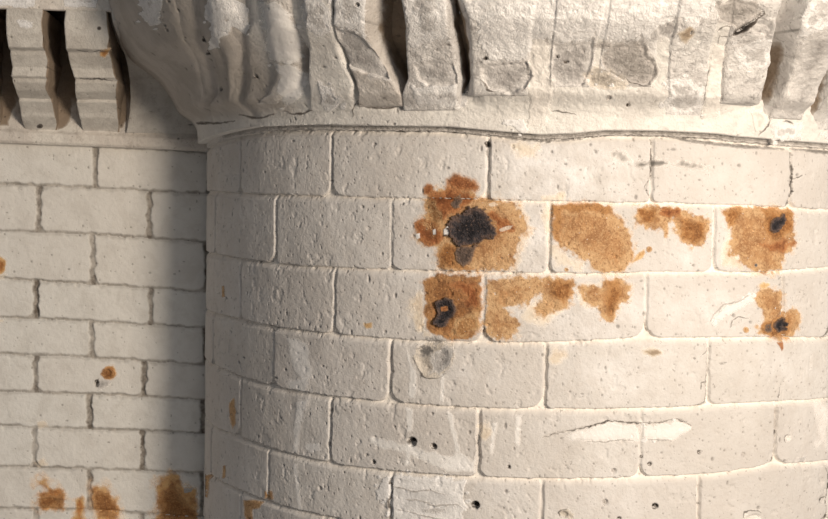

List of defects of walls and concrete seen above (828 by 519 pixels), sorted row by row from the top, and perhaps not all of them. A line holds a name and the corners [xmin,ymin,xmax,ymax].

peeling [136,0,163,30]
peeling [203,0,391,112]
rust [414,174,711,342]
rust [722,205,801,350]
rust [98,366,116,389]
peeling [545,418,691,443]
rust [37,478,65,510]
rust [72,486,121,519]
rust [155,465,226,519]
peeling [375,470,471,519]